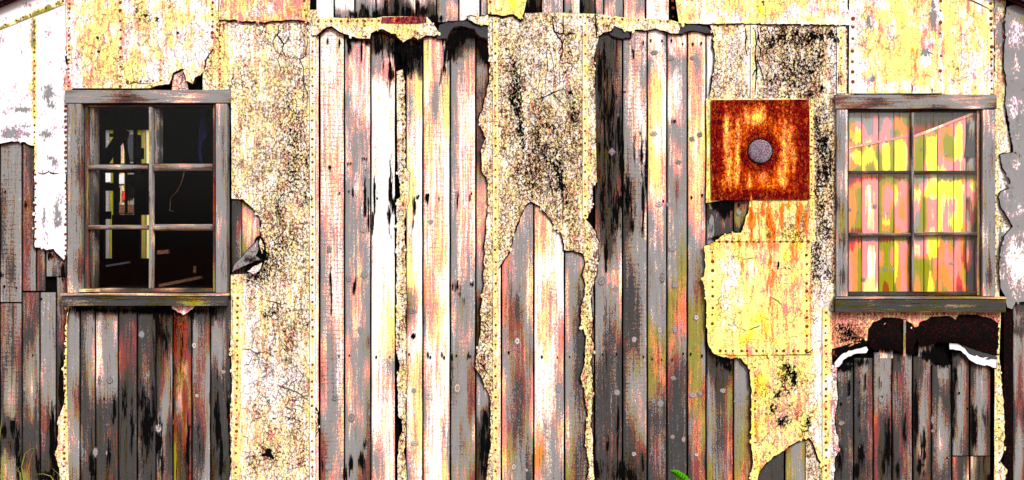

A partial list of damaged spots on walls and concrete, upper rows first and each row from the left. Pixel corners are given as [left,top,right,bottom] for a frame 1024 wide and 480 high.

peeling [32,172,67,261]
peeling [54,306,71,468]
peeling [309,11,525,480]
leakage [507,55,581,227]
peeling [499,136,600,480]
rust [748,195,809,342]
leakage [766,359,811,428]
leakage [763,28,842,281]
peeling [701,200,1008,480]
peeling [993,0,1019,309]